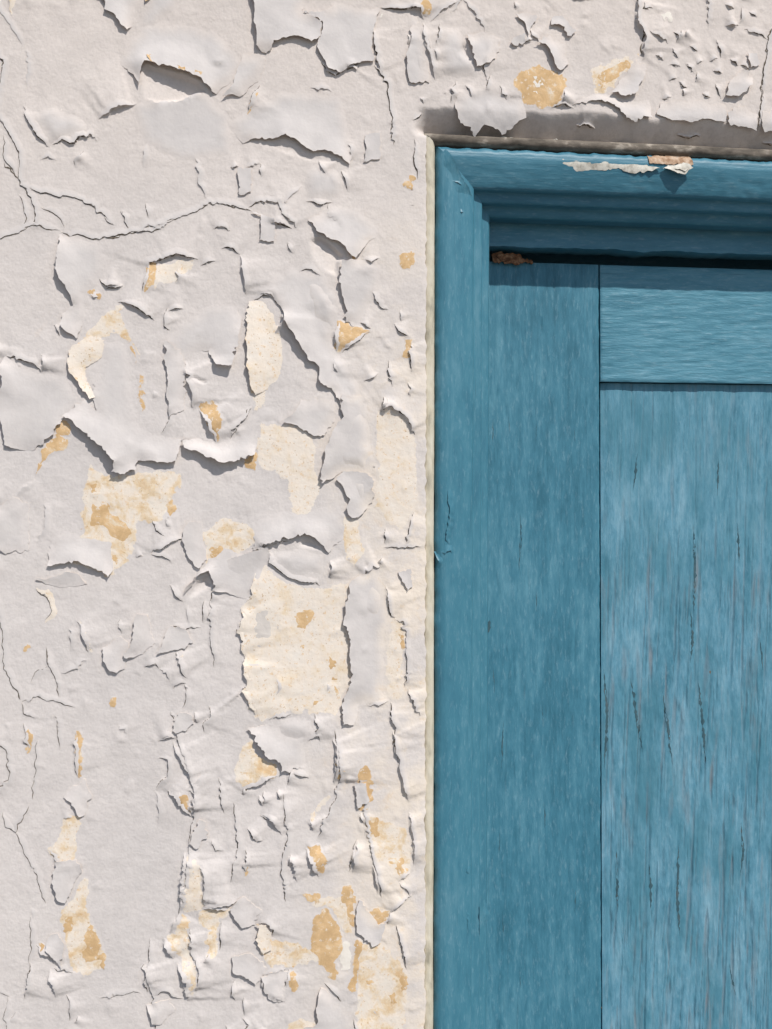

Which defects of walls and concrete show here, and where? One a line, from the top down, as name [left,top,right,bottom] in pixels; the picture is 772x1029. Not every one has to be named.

peeling [562,155,693,174]
peeling [553,0,772,146]
peeling [0,0,576,1029]
crack [0,588,77,964]